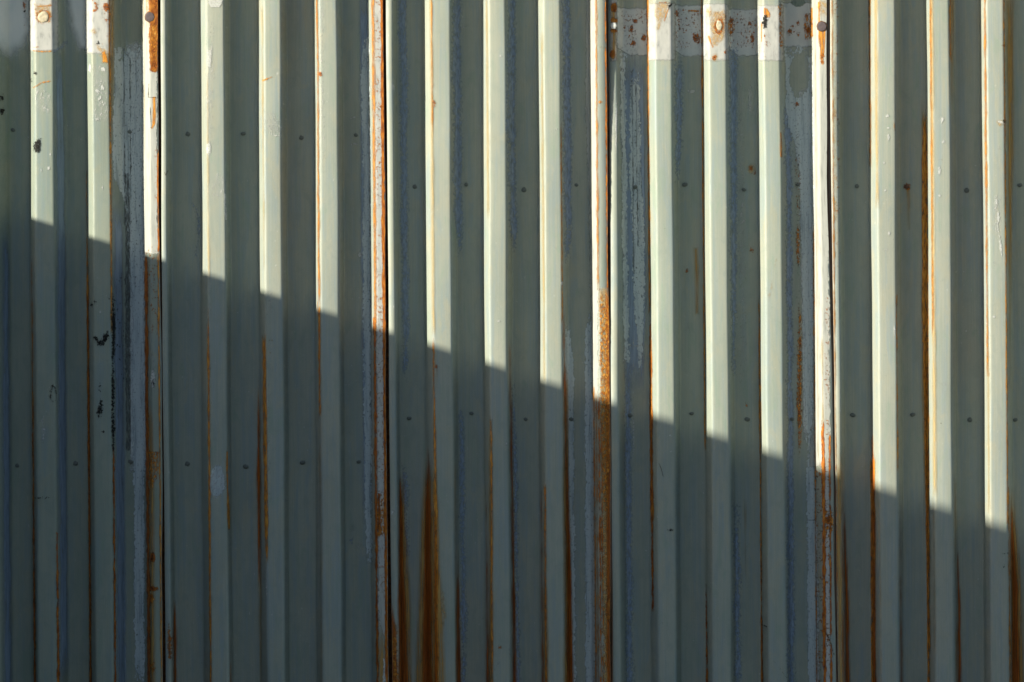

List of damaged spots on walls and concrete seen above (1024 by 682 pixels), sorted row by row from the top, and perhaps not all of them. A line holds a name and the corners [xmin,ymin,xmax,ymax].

peeling [0,0,159,682]
rust [147,0,158,72]
rust [144,153,176,682]
rust [371,0,461,682]
rust [593,0,611,682]
peeling [609,0,831,682]
rust [796,232,850,682]
rust [826,101,840,376]